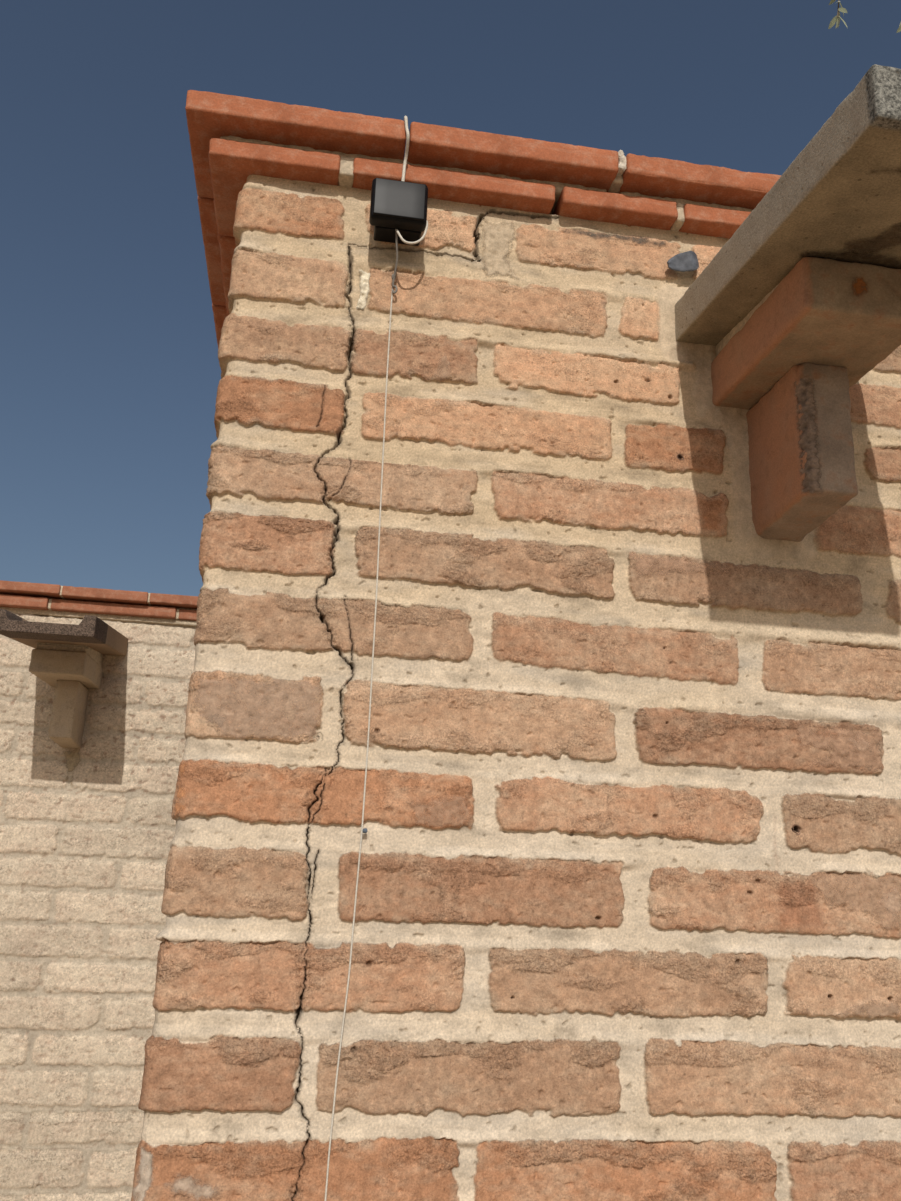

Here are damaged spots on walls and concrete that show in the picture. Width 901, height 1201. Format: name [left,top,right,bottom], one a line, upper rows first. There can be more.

crack [289,208,560,1201]
damp [802,224,901,269]